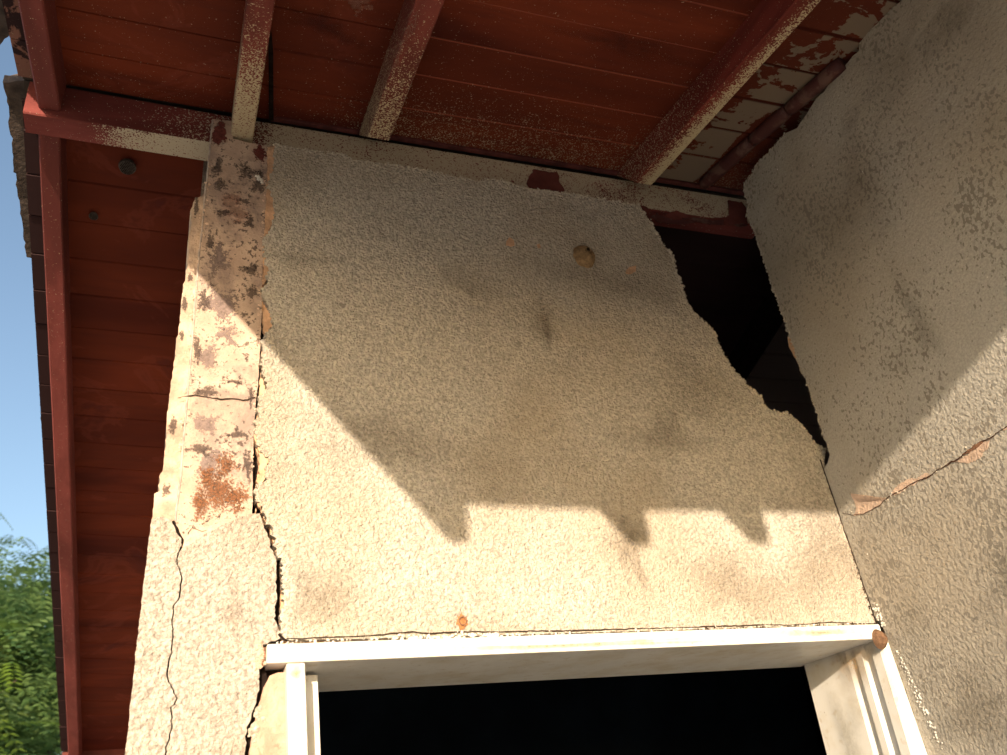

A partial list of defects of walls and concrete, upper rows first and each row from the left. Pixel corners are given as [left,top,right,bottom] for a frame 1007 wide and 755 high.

peeling [211,119,227,145]
peeling [252,132,829,451]
crack [179,146,1007,755]
spalling [182,492,250,548]
corrosion [190,451,252,525]
crack [165,521,193,755]
corrosion [456,612,468,630]